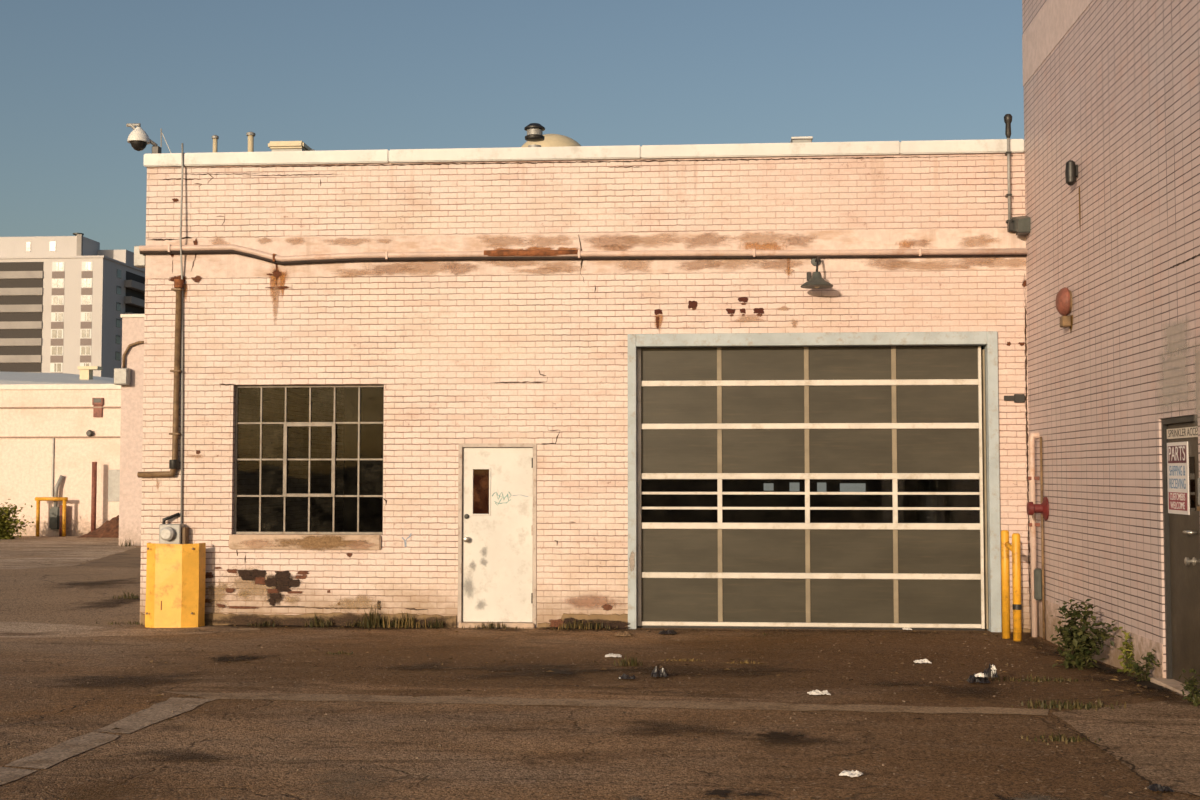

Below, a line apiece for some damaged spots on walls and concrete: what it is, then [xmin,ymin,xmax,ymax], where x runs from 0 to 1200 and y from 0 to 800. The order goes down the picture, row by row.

corrosion [484,247,579,256]
corrosion [169,275,202,297]
corrosion [265,264,289,316]
spalling [726,297,764,321]
peeling [205,567,309,609]